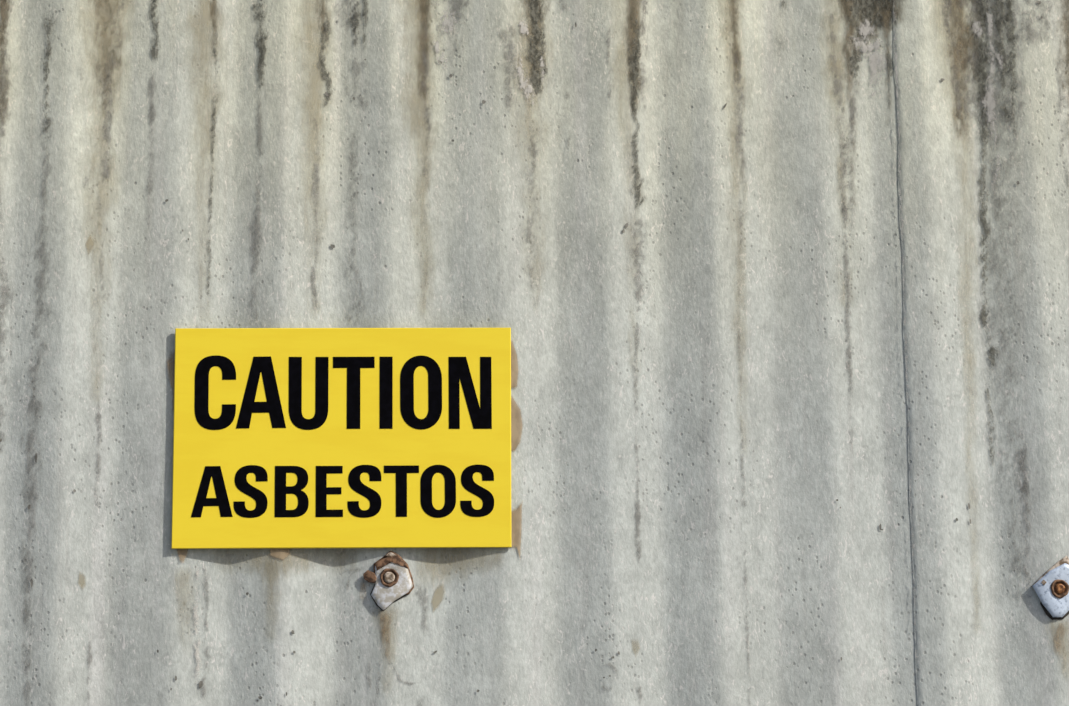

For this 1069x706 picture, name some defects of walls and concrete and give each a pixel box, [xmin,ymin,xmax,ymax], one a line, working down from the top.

damp [95,0,118,90]
damp [941,0,1016,334]
corrosion [363,552,408,587]